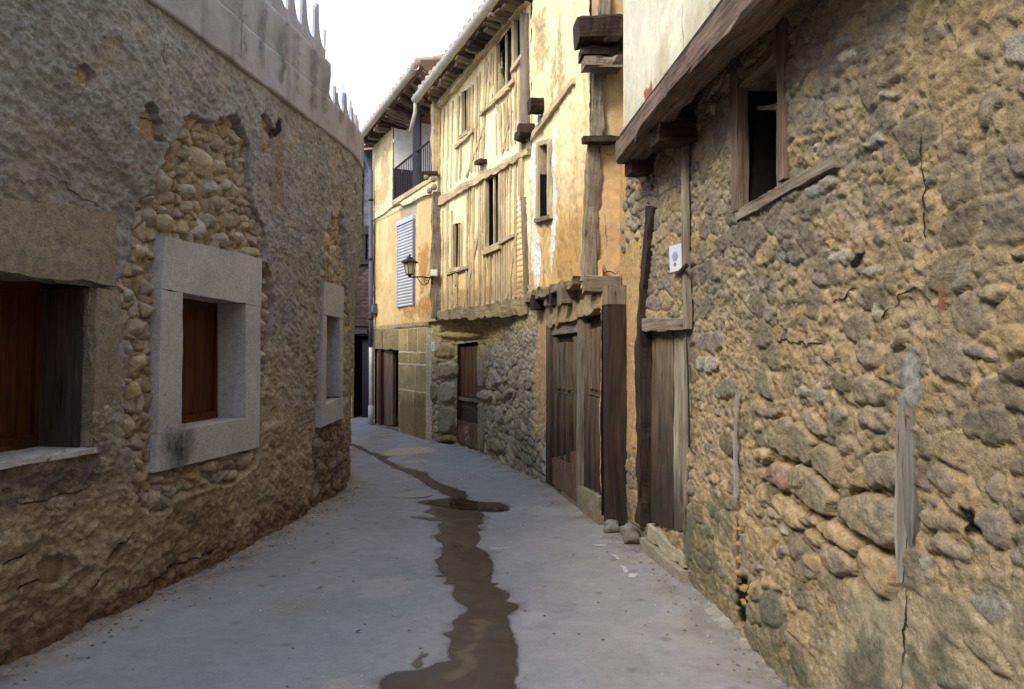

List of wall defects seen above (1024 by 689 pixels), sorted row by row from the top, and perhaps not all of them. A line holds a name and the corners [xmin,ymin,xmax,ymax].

crack [15,175,103,207]
flaking render [259,119,281,151]
crack [919,121,927,238]
flaking render [116,117,270,519]
flaking render [302,217,352,515]
crack [10,483,94,510]
crack [139,544,222,589]
crack [900,585,909,689]